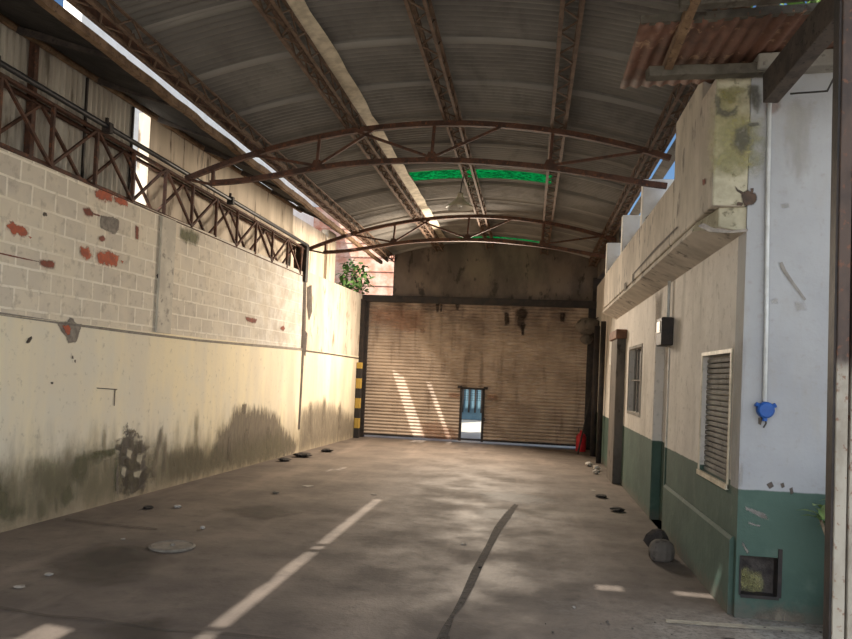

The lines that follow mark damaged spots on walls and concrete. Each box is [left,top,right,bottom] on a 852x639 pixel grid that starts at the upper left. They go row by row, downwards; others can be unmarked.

water stain [749,86,760,109]
water stain [734,123,759,153]
peeling [7,221,32,239]
peeling [80,247,123,267]
spalling [58,318,82,343]
water stain [152,401,354,477]